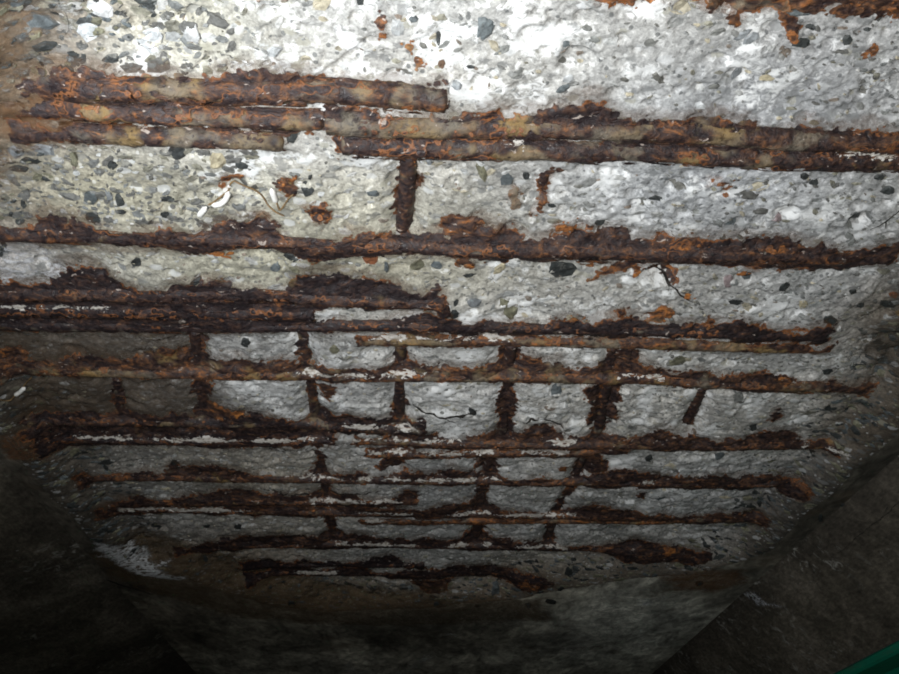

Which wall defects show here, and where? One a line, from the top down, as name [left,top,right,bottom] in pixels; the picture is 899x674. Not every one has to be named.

rust [595,0,655,9]
rust [692,0,899,44]
rust [305,202,332,225]
rust [565,231,713,285]
rust [4,400,338,460]
spalling [208,380,310,422]
spalling [315,380,395,421]
crack [413,405,477,423]
spalling [404,382,503,440]
spalling [511,383,595,439]
rust [580,384,623,426]
spalling [9,401,797,576]